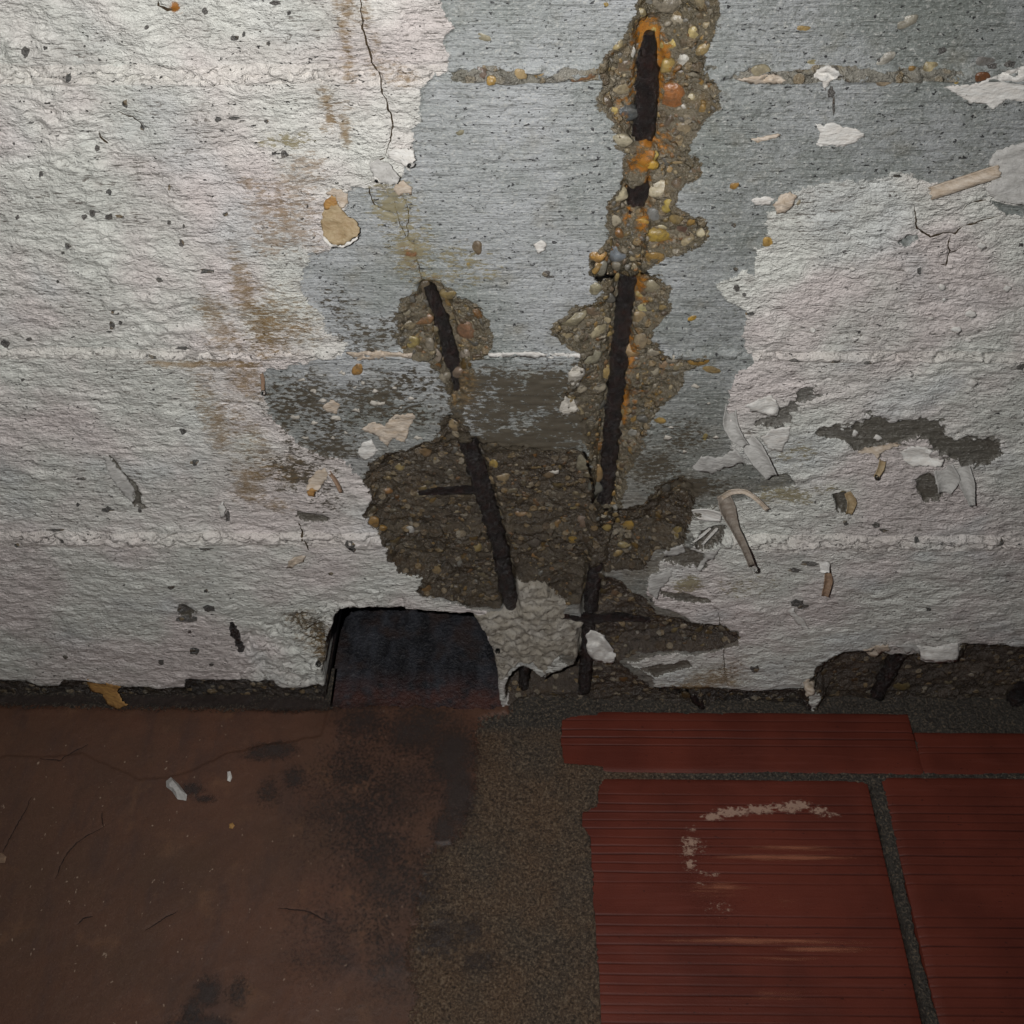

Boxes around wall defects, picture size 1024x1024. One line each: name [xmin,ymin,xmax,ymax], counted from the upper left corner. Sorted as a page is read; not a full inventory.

crack [360,0,394,160]
rust [618,17,676,231]
crack [369,188,422,279]
crack [914,199,1001,266]
rust [597,273,648,505]
peeling [258,0,1024,710]
rust [557,563,650,695]